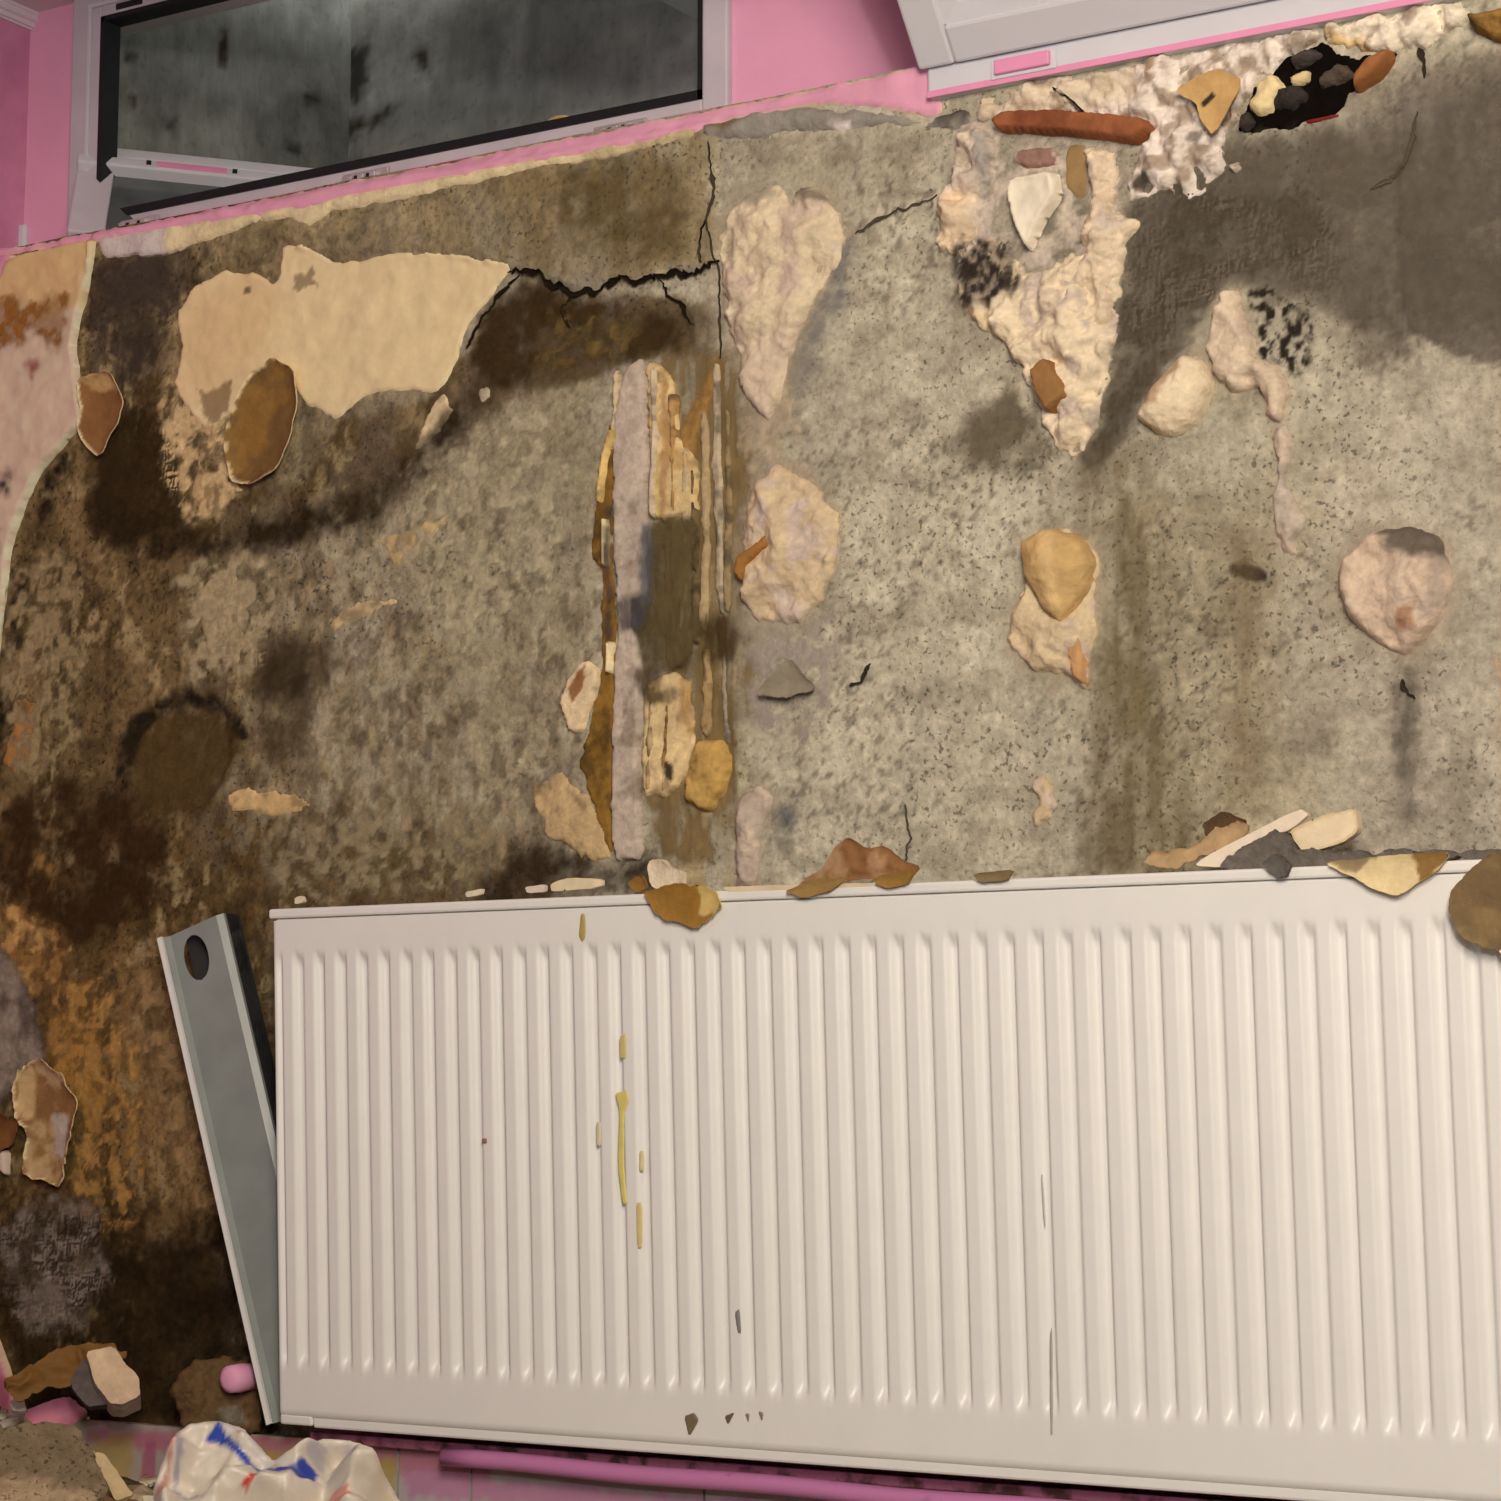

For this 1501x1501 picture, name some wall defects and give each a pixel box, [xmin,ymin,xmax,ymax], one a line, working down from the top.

water stain [471,284,618,388]
crack [466,141,722,359]
flaking render [0,1,1501,656]
water stain [1082,94,1501,465]
water stain [89,408,380,558]
flaking render [1008,528,1102,690]
water stain [0,636,325,943]
water stain [483,847,592,900]
peeling [628,876,722,928]
peeling [1328,852,1450,896]
peeling [1448,852,1501,953]
flaking render [0,951,127,1414]